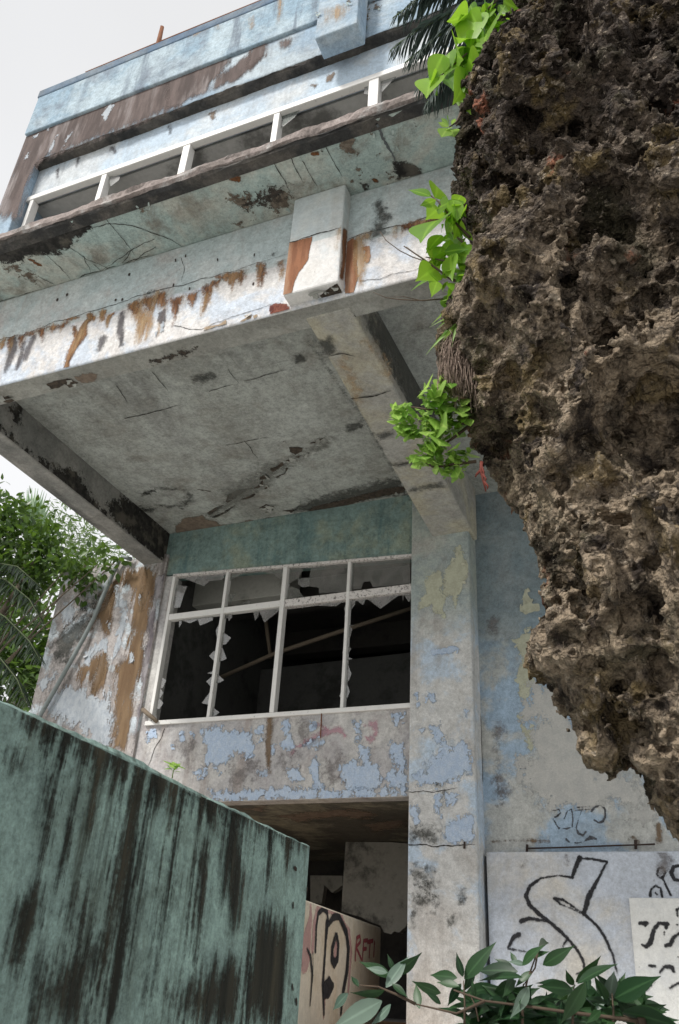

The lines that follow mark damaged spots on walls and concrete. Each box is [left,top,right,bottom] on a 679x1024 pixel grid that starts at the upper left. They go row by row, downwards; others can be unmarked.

leakage [0,38,292,221]
corrosion [0,310,115,368]
crack [0,217,426,340]
corrosion [128,236,312,340]
corrosion [339,229,371,293]
crack [117,372,177,419]
leakage [0,403,333,560]
peeling [83,585,141,667]
peeling [418,545,468,619]
peeling [37,668,118,746]
leakage [2,566,439,1024]
peeling [170,719,475,845]